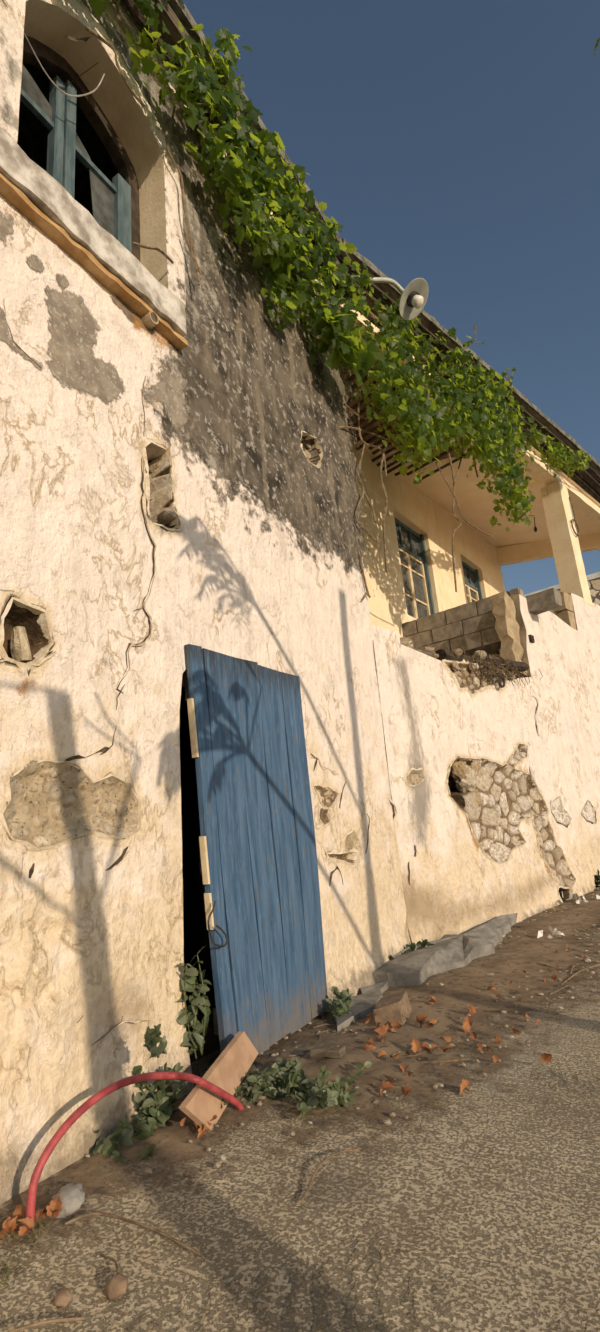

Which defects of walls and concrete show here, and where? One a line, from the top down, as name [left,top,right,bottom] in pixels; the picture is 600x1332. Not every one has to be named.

peeling [0,211,14,246]
peeling [0,254,125,404]
peeling [110,296,156,332]
peeling [141,364,191,431]
spalling [142,439,181,532]
spalling [300,431,323,468]
crack [100,376,157,755]
spalling [0,597,54,673]
spalling [0,760,141,851]
spalling [404,767,425,787]
spalling [446,743,597,903]